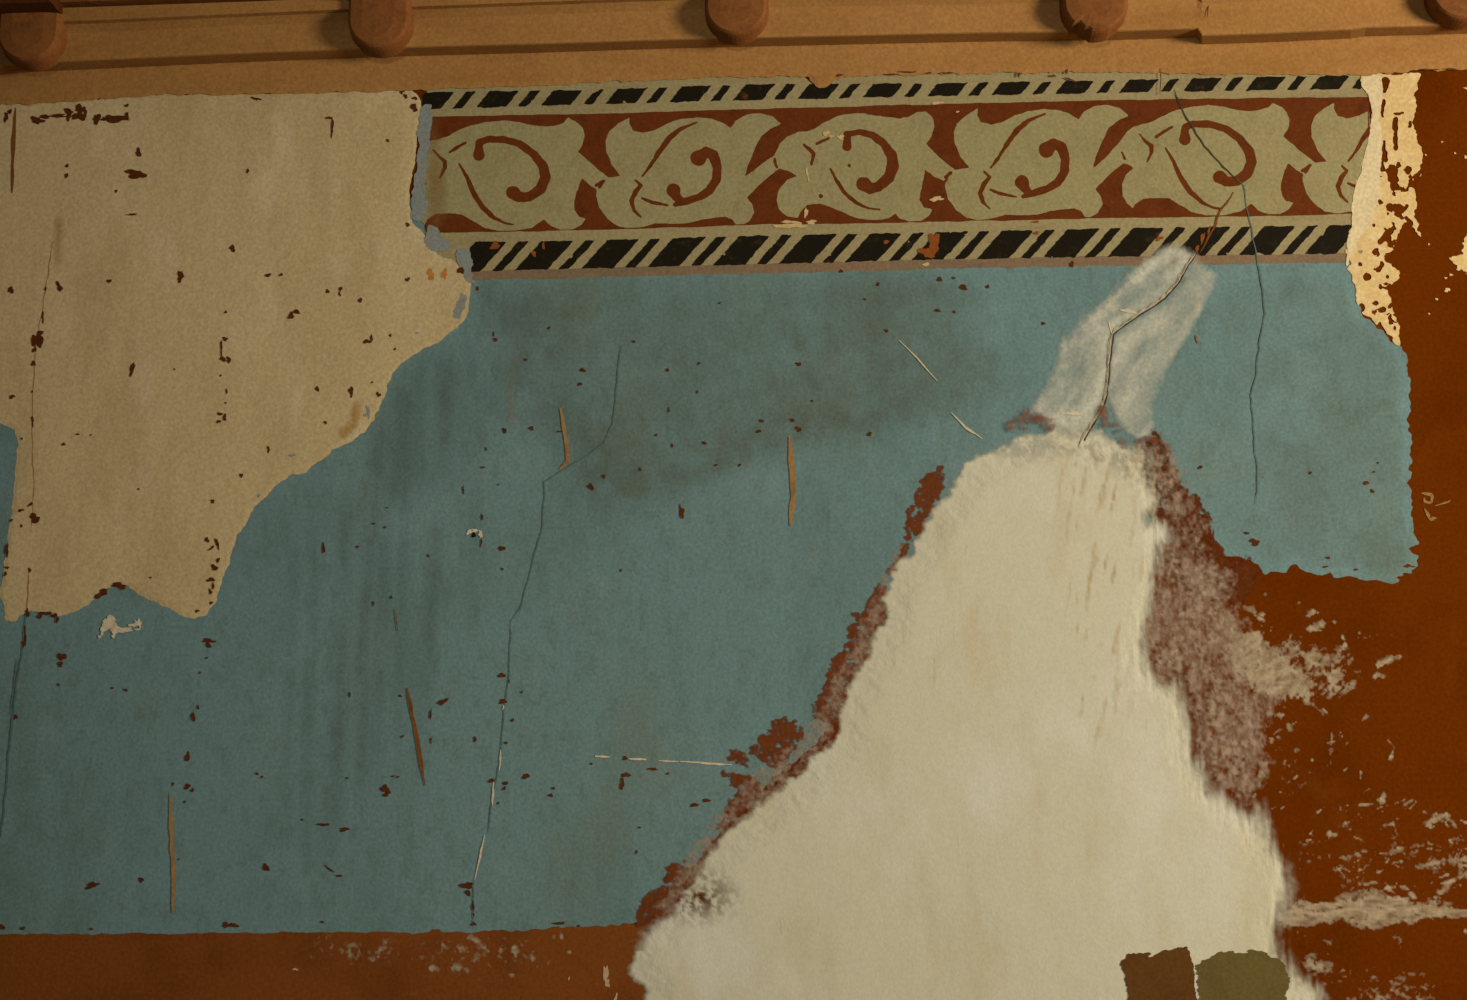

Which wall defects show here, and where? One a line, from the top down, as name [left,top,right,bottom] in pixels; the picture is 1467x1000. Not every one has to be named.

peeling [1345,68,1457,346]
peeling [918,233,989,290]
crack [1061,68,1266,497]
peeling [1449,236,1467,274]
peeling [0,90,479,648]
peeling [466,513,506,570]
peeling [459,882,477,926]